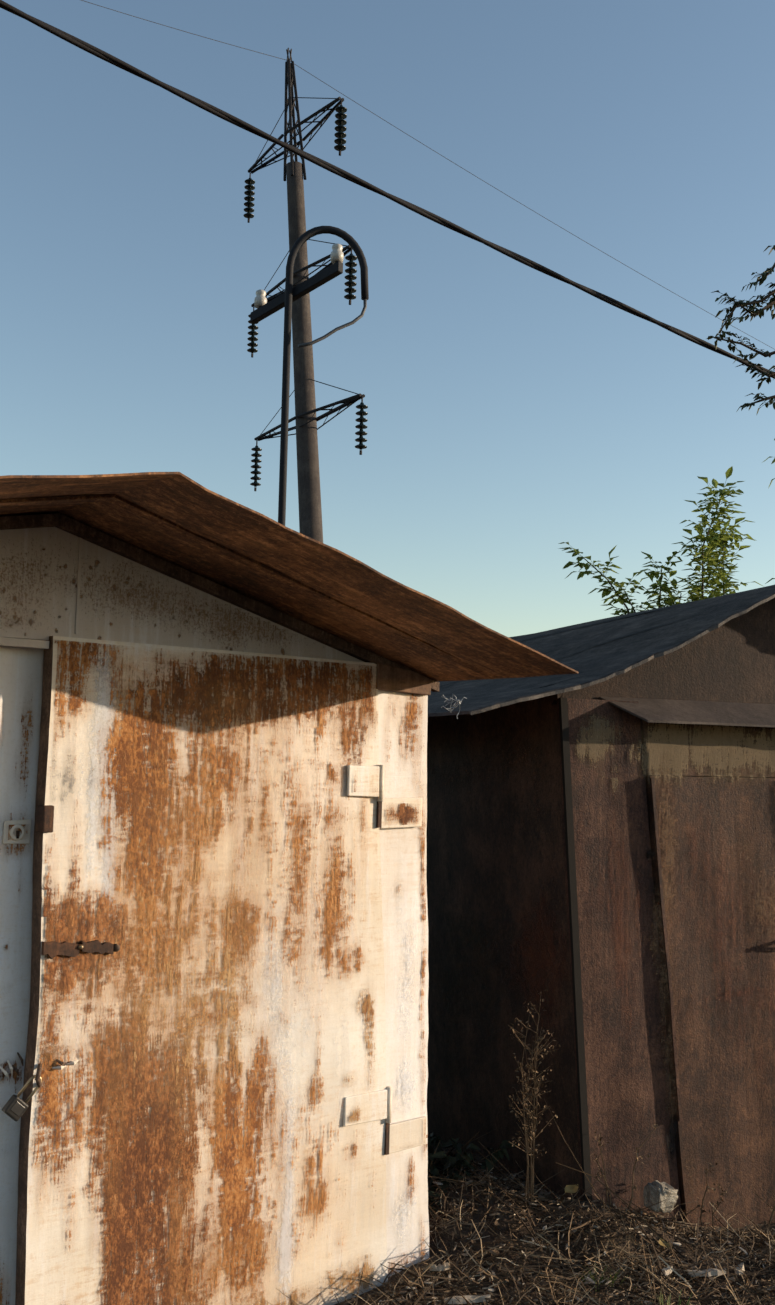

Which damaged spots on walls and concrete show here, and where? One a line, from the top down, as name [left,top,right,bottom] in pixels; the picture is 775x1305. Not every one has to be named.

corrosion [15,699,33,787]
peeling [575,714,775,792]
corrosion [6,813,28,855]
corrosion [34,608,428,1305]
corrosion [645,773,694,1179]
corrosion [0,1060,22,1093]